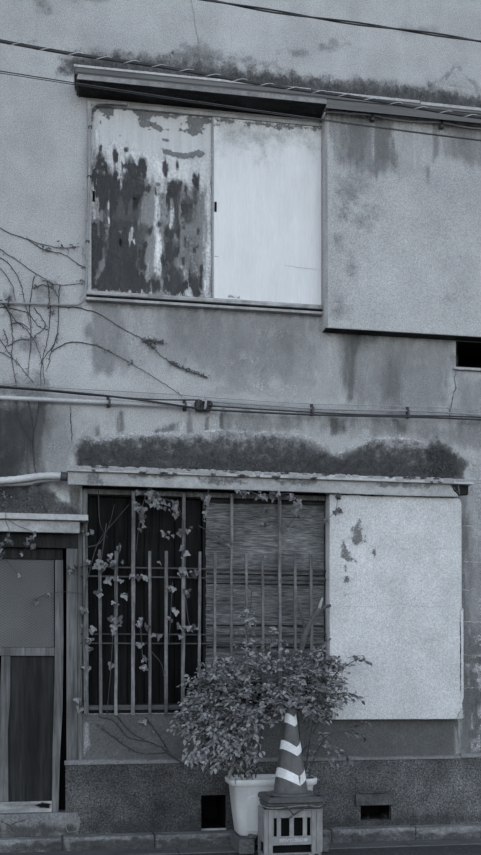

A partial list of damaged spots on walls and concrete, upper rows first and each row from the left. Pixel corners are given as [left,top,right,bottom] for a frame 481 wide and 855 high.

peeling [91,106,211,298]
water stain [87,303,453,410]
water stain [461,519,481,753]